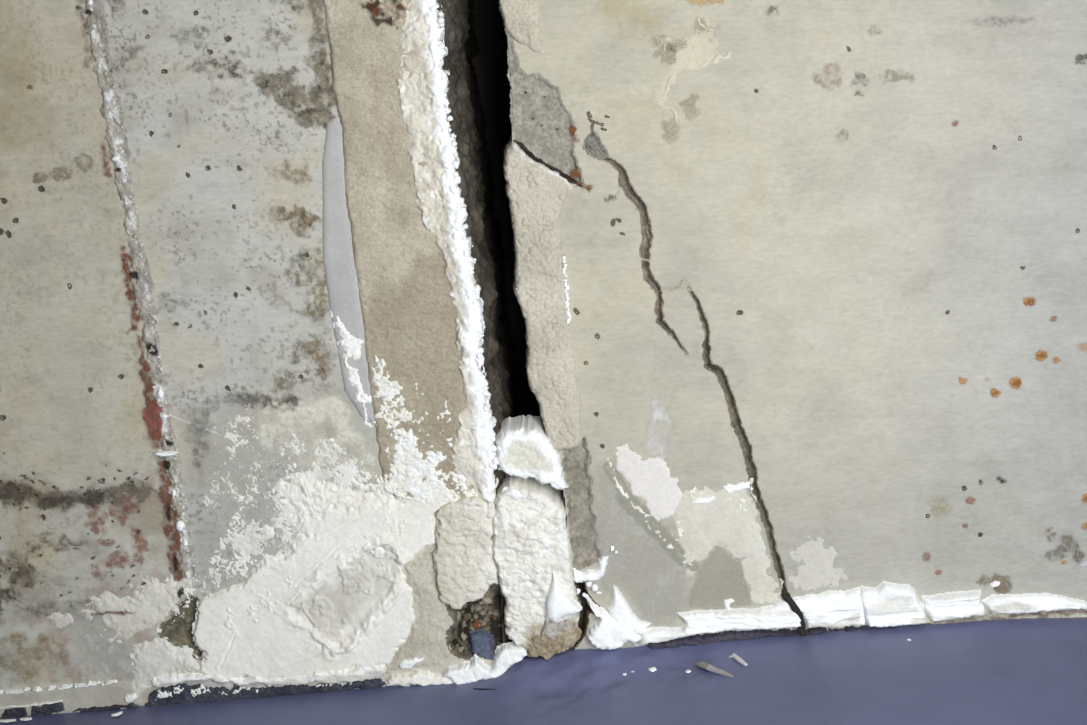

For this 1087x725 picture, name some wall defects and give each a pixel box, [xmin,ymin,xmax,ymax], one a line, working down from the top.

rust [122,247,163,448]
crack [437,0,545,496]
peeling [503,27,602,571]
crack [582,111,807,636]
rust [990,377,1022,397]
rust [158,462,183,581]
spalling [158,594,203,661]
spalling [445,576,513,660]
crack [500,594,508,644]